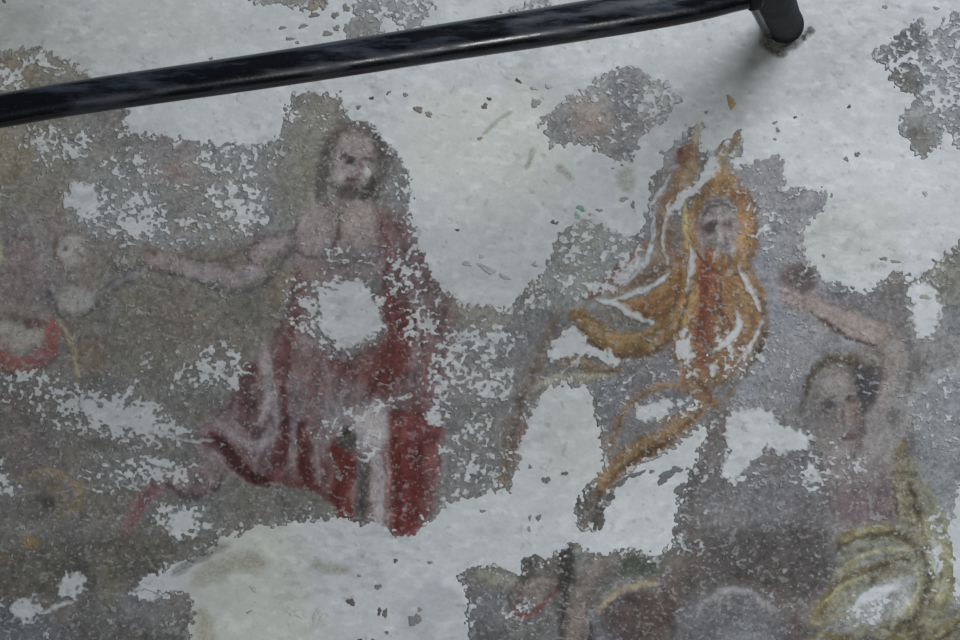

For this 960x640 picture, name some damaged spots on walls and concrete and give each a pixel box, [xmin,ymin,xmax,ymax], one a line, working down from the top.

peeling [0,45,91,93]
peeling [0,90,527,640]
peeling [515,65,683,169]
peeling [456,122,960,640]